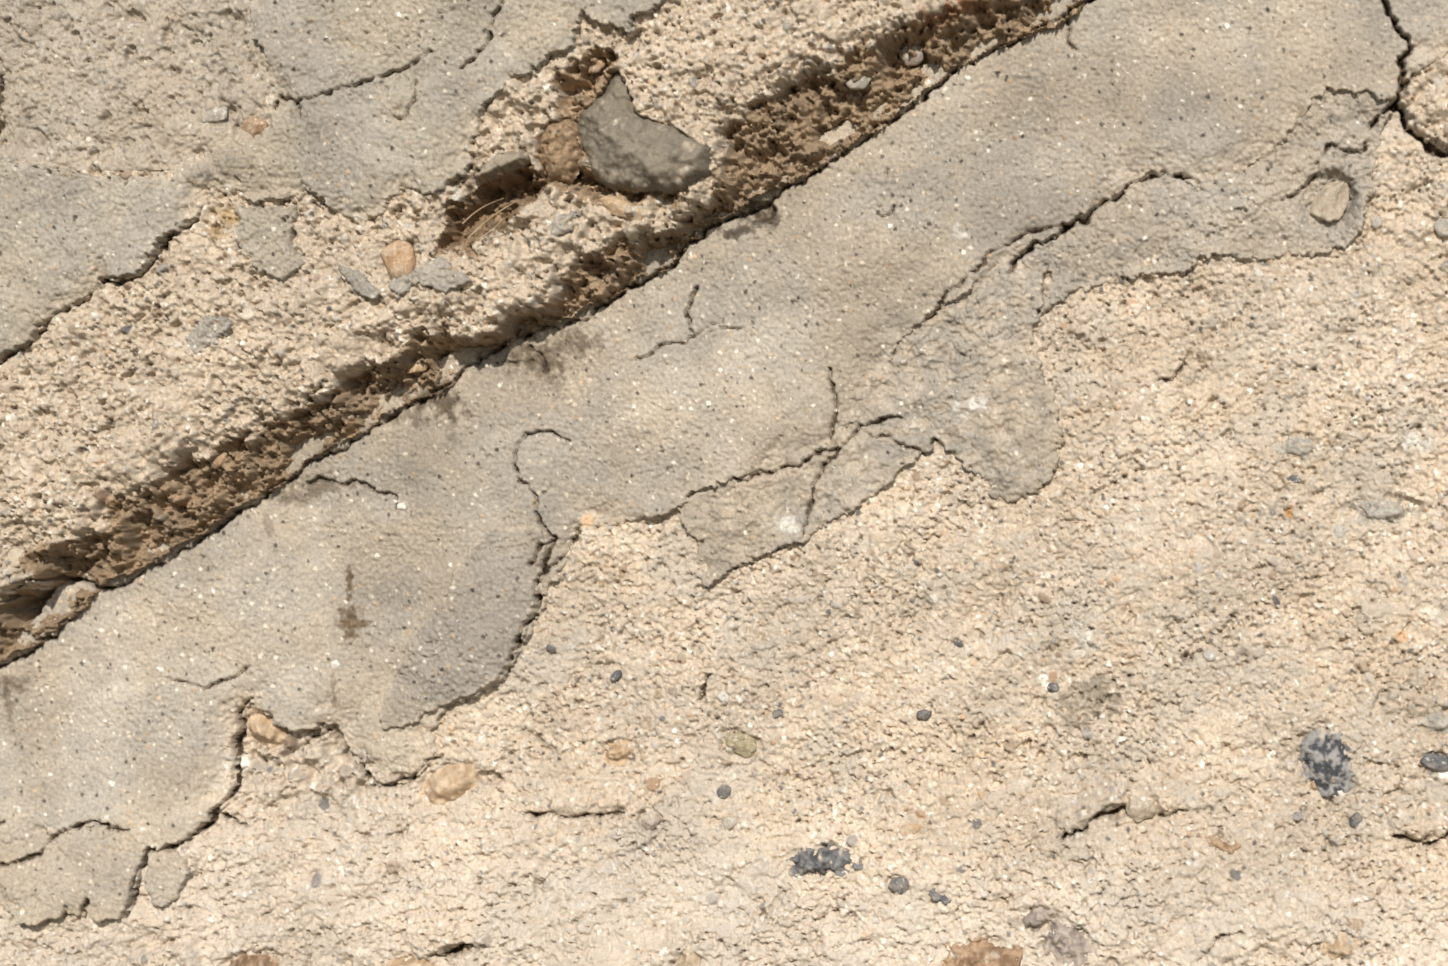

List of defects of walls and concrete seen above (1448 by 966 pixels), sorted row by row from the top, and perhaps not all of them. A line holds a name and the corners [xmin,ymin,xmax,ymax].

crack [1281,0,1448,201]
spalling [0,0,959,595]
crack [0,0,1095,668]
flaking render [677,247,1066,587]
crack [925,172,1202,321]
crack [0,665,254,919]
flaking render [378,524,548,730]
crack [699,674,711,700]